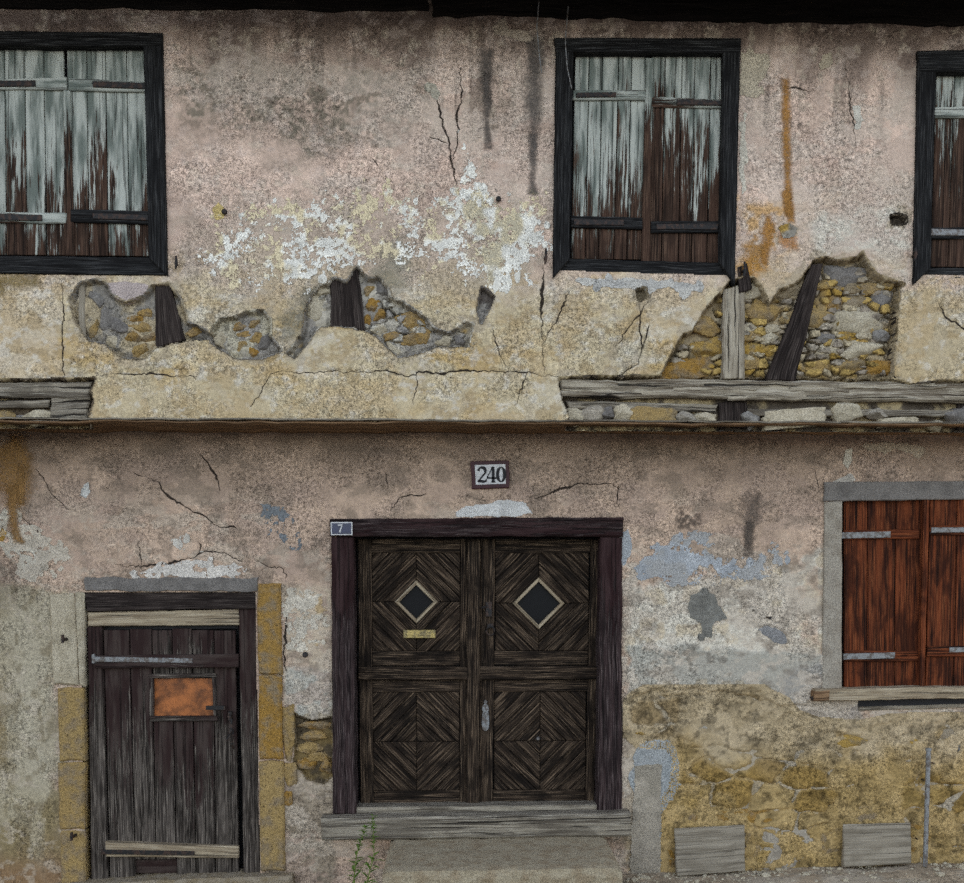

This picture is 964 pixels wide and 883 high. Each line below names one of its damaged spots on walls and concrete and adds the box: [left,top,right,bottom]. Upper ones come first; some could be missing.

crack [430,67,463,184]
water stain [480,50,493,148]
water stain [527,37,543,194]
rust [782,80,794,222]
peeling [68,143,553,360]
rust [745,216,796,274]
flaking render [558,250,964,482]
crack [939,305,964,330]
rust [0,437,31,543]
crack [133,472,237,529]
crack [115,543,287,576]
peeling [620,529,791,641]